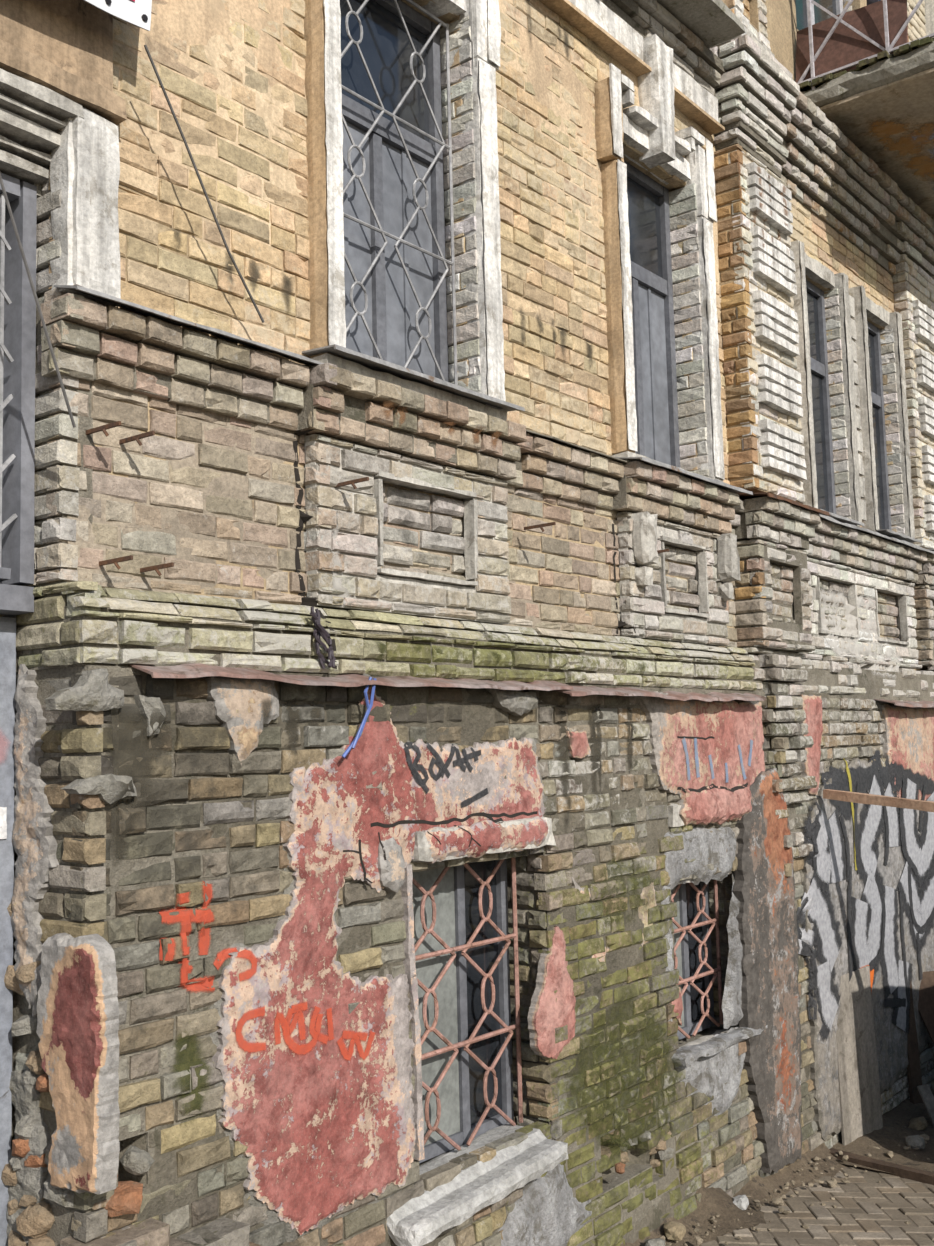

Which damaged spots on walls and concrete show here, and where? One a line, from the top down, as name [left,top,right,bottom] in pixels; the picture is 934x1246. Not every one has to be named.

peeling [637,691,766,825]
peeling [797,695,823,795]
peeling [1,664,154,1246]
peeling [205,673,548,1242]
spalling [527,926,576,1060]